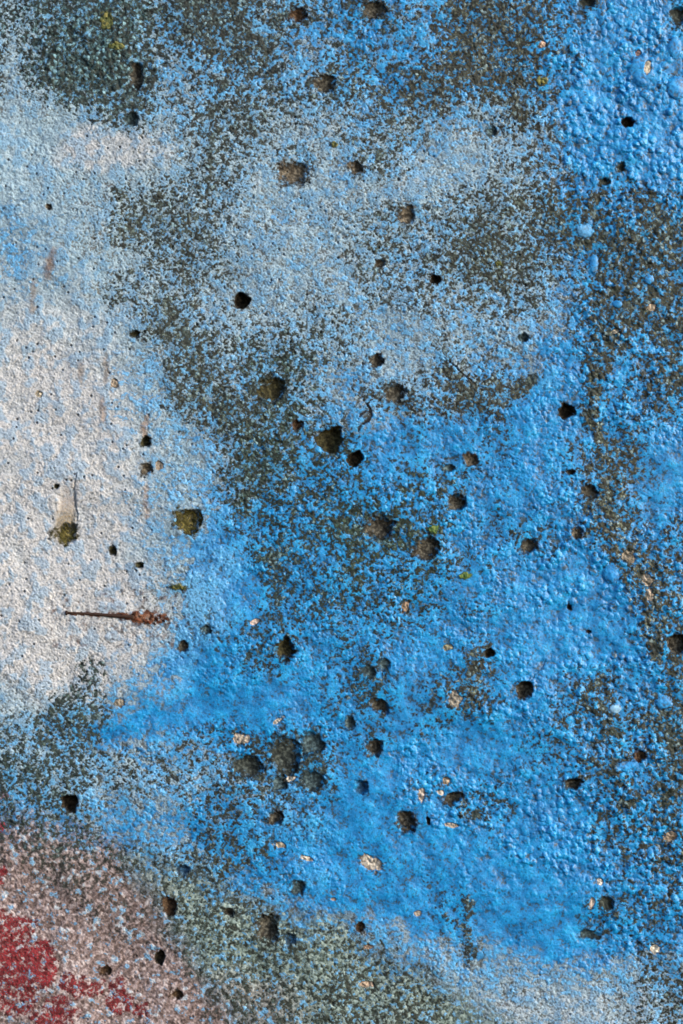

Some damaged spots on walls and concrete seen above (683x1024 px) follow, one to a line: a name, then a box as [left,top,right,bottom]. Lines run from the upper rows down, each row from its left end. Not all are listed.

corrosion [70,610,170,626]